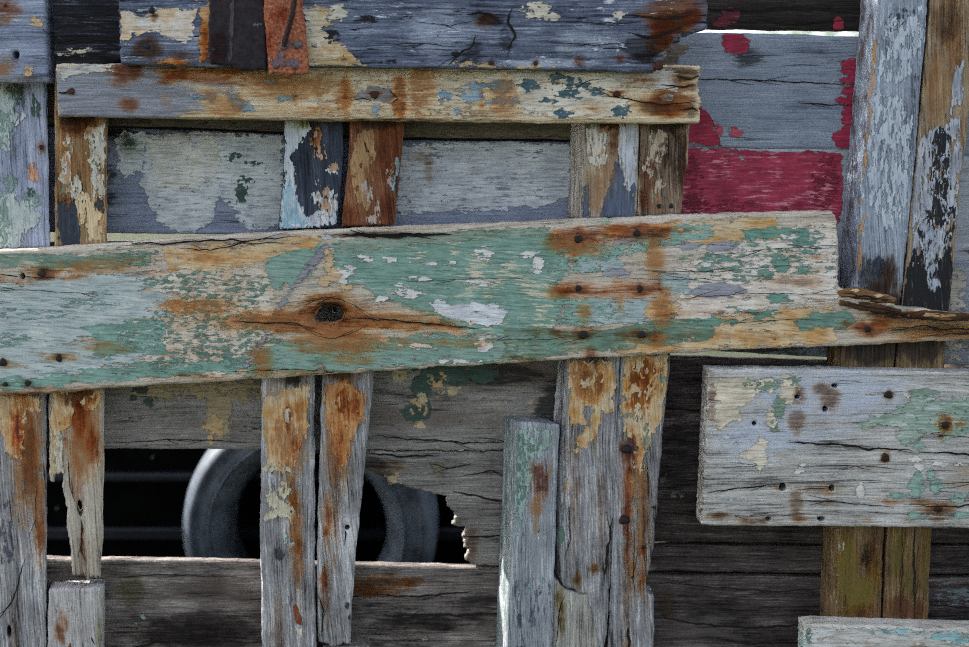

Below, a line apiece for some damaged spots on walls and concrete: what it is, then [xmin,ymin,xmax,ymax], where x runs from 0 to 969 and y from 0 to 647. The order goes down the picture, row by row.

peeling [848,7,968,318]
corrosion [231,294,434,362]
peeling [0,0,857,564]
corrosion [571,356,604,397]
corrosion [630,361,661,408]
crack [633,244,969,338]
corrosion [12,397,43,517]
peeling [854,387,969,520]
crack [660,432,969,618]
peeling [805,627,969,647]